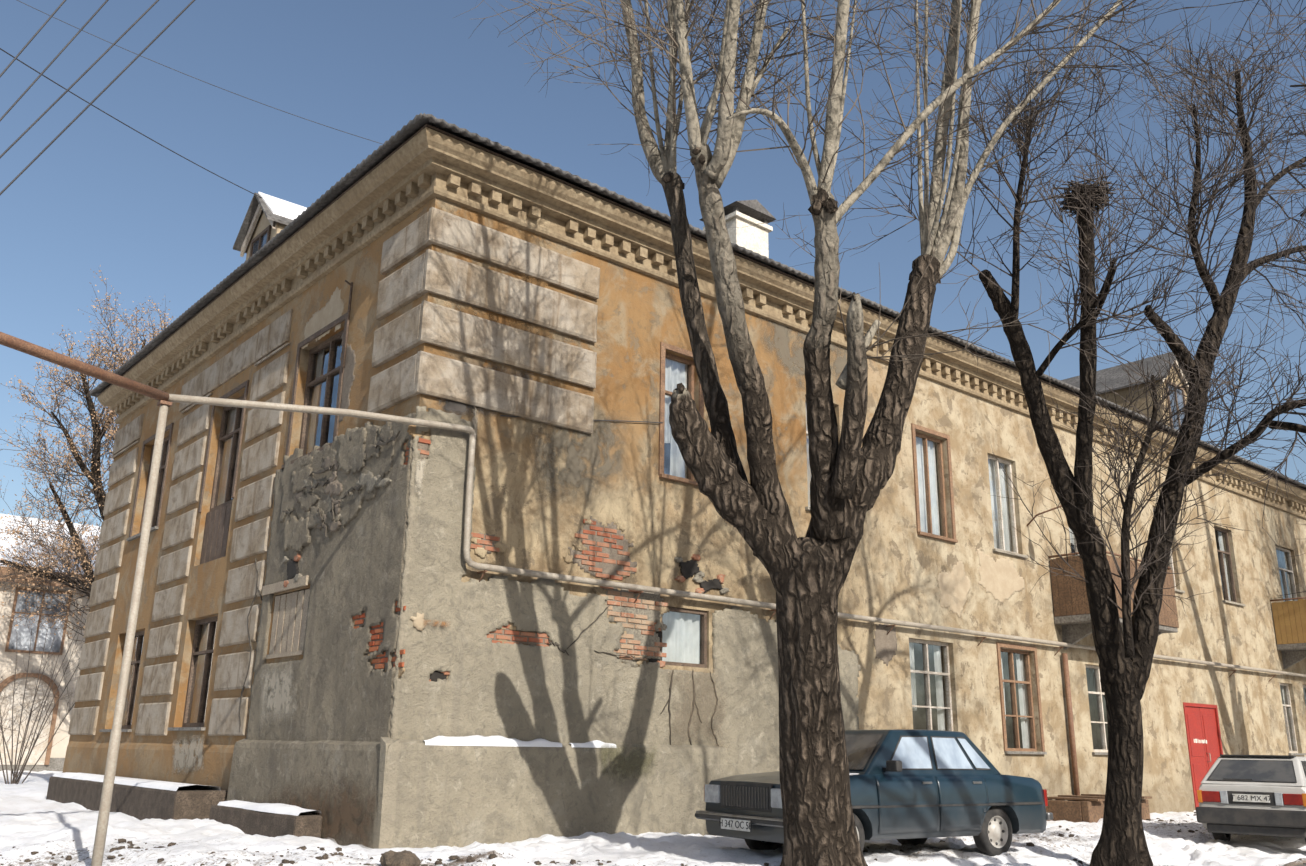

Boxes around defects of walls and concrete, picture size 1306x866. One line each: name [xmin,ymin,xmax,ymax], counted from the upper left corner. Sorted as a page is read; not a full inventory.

spalling [470,532,507,558]
spalling [563,516,670,668]
spalling [395,601,426,631]
spalling [352,610,405,678]
spalling [486,622,552,647]